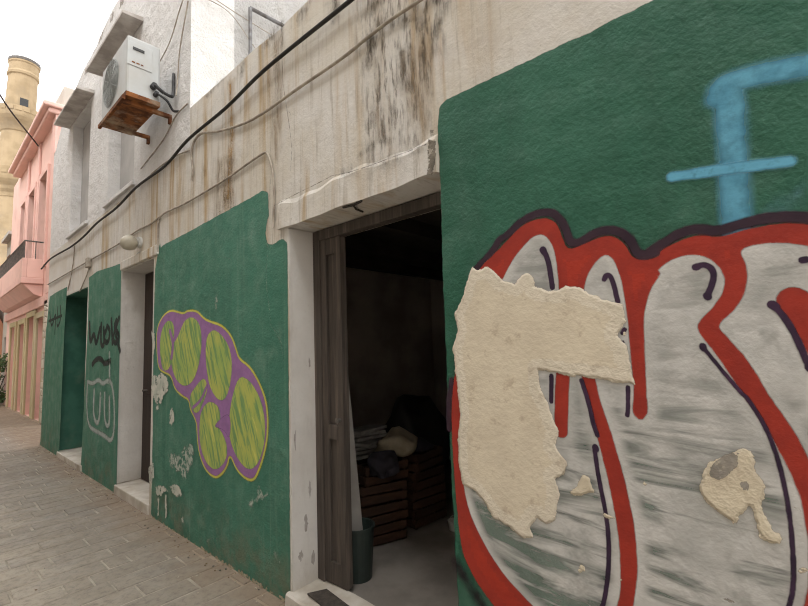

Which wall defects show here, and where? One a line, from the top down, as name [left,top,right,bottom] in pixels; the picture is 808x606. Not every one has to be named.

leakage [366,0,442,118]
peeling [151,373,168,410]
peeling [452,267,635,539]
peeling [699,448,782,544]